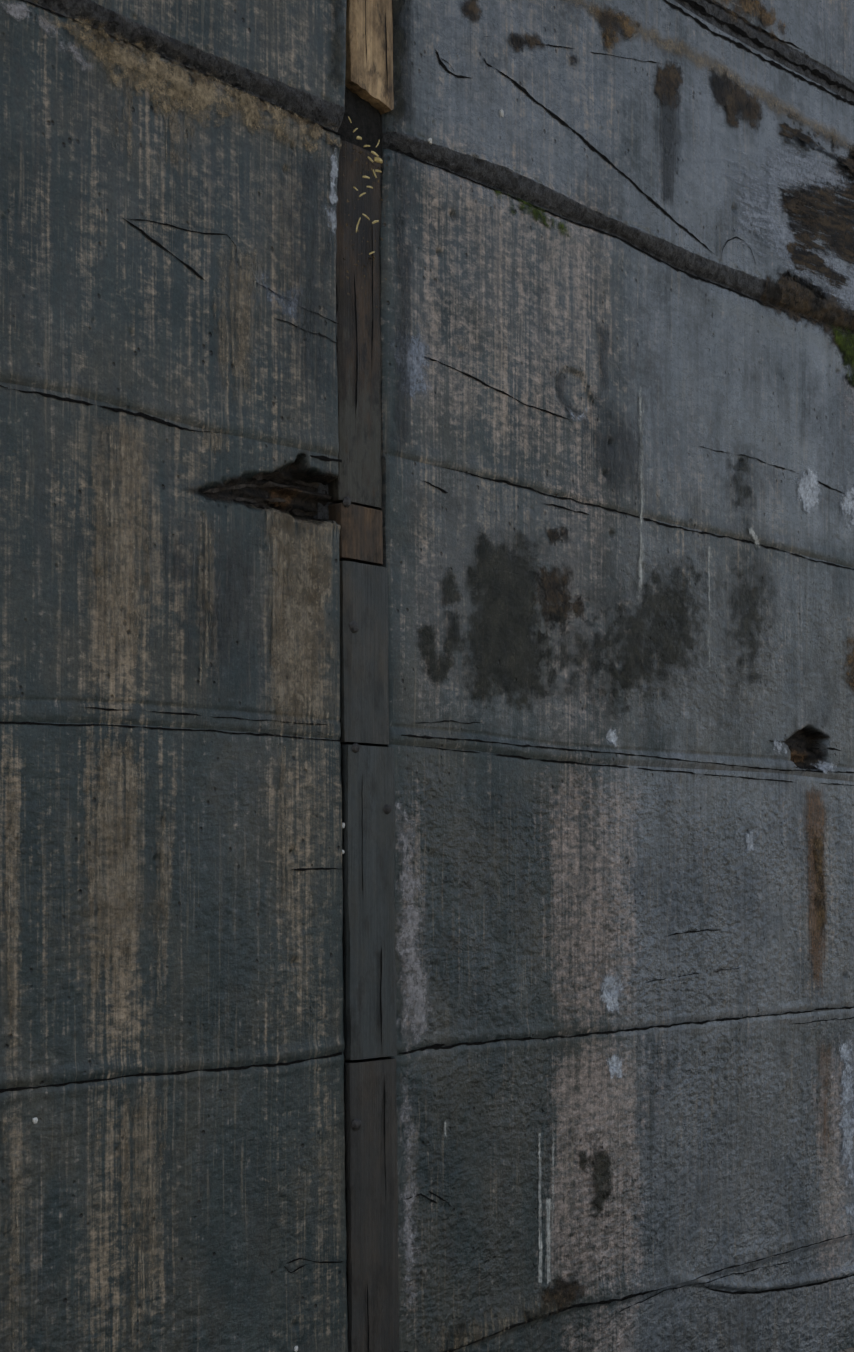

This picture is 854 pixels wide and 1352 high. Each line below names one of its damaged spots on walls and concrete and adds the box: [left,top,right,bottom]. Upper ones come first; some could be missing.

damp [7,1,341,387]
damp [394,152,429,444]
crack [395,36,817,323]
damp [634,25,854,203]
damp [726,146,854,335]
spalling [194,458,340,532]
damp [418,396,772,713]
damp [606,729,617,746]
spalling [768,728,841,774]
rust [806,791,827,988]
damp [579,1151,612,1216]